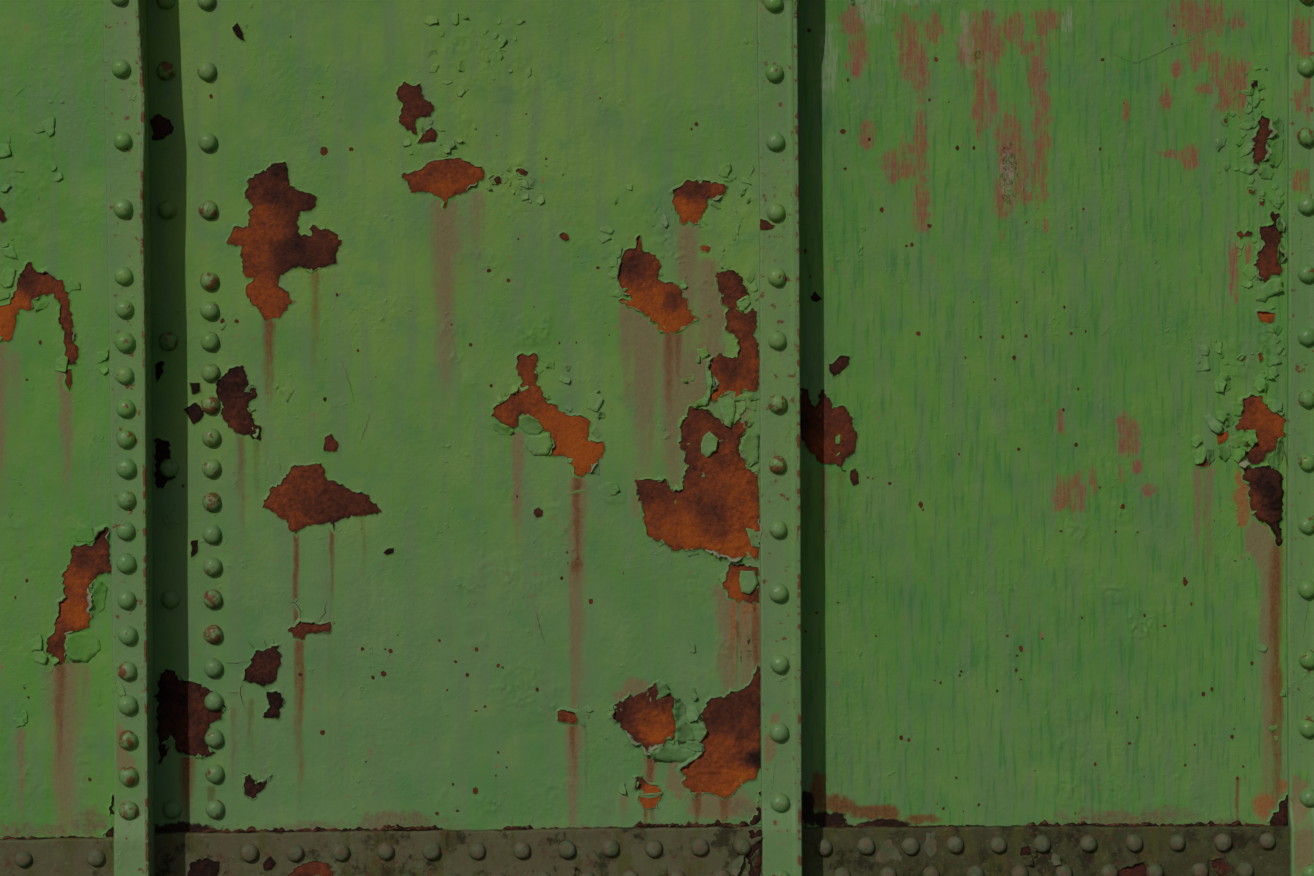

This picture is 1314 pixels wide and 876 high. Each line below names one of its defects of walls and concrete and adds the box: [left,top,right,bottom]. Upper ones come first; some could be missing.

rust [0,204,9,225]
rust [0,242,81,393]
peeling [397,5,571,212]
rust [1214,66,1287,325]
rust [153,158,762,876]
rust [800,353,891,614]
rust [0,522,114,840]